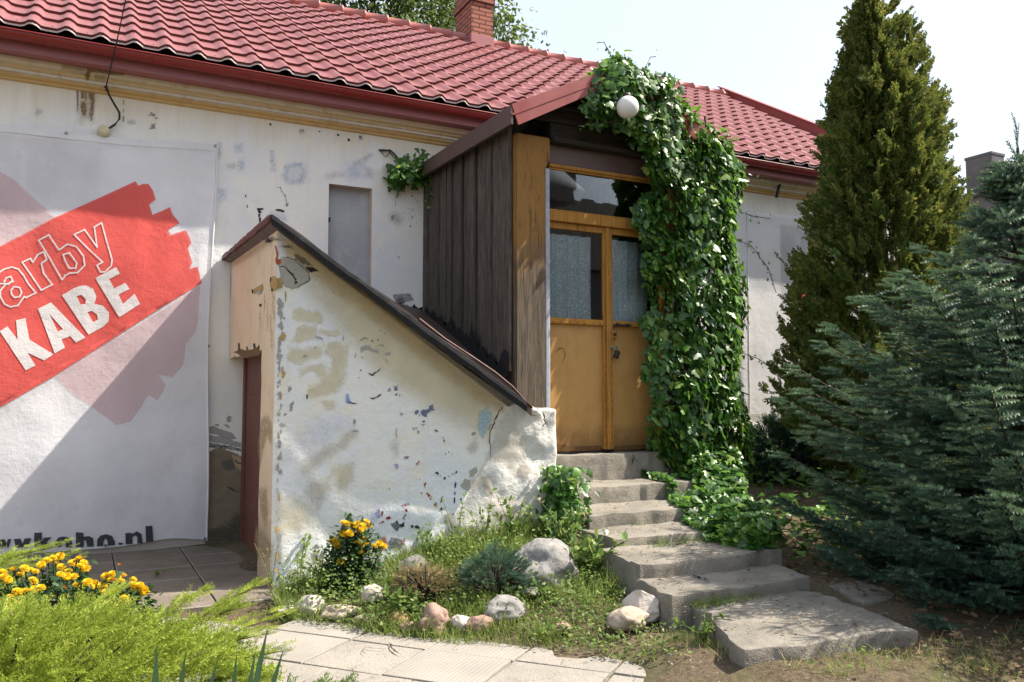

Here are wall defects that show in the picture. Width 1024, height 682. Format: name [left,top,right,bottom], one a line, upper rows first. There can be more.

damp [77,68,124,120]
peeling [205,416,241,544]
peeling [252,246,391,579]
peeling [400,404,453,455]